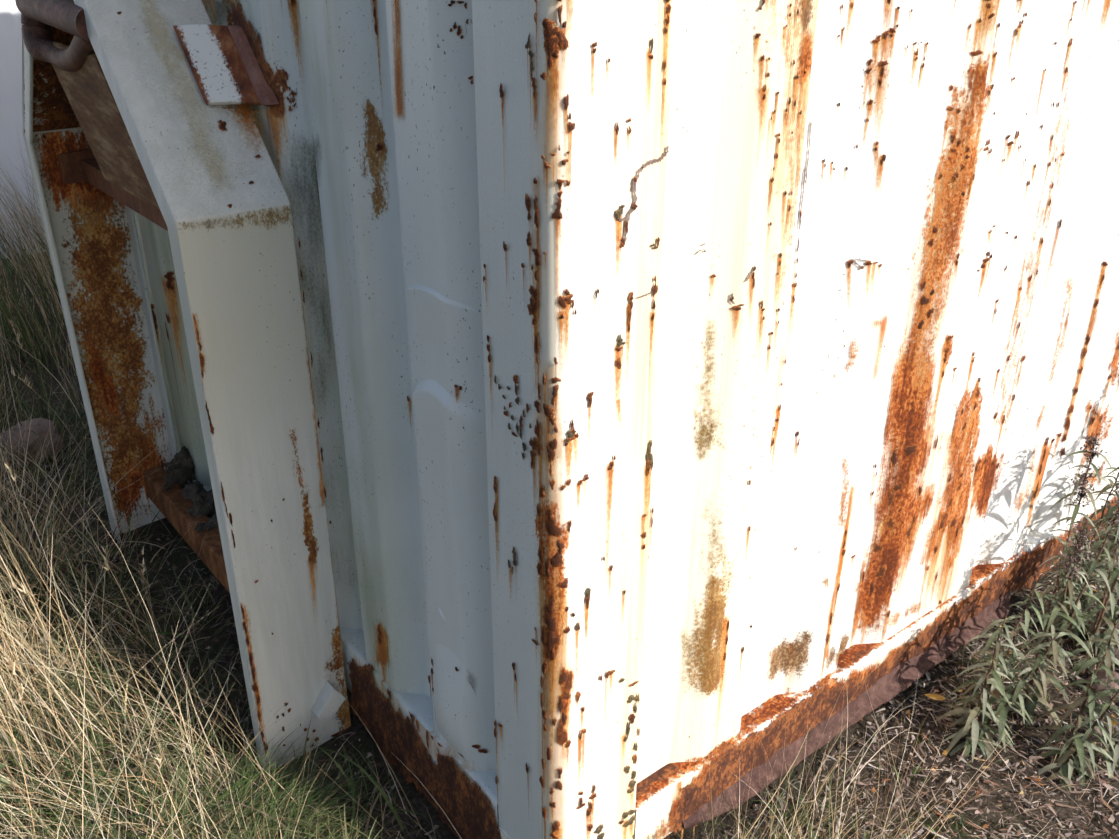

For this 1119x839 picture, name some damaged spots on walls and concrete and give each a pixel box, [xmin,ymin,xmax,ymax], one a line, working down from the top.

corrosion [24,57,184,534]
corrosion [193,315,205,378]
corrosion [290,354,333,598]
corrosion [362,100,388,218]
corrosion [521,0,591,839]
corrosion [603,455,626,606]
corrosion [615,205,625,262]
corrosion [615,118,632,156]
crack [619,145,669,248]
corrosion [635,0,1119,839]
corrosion [241,605,268,755]
corrosion [577,784,597,835]